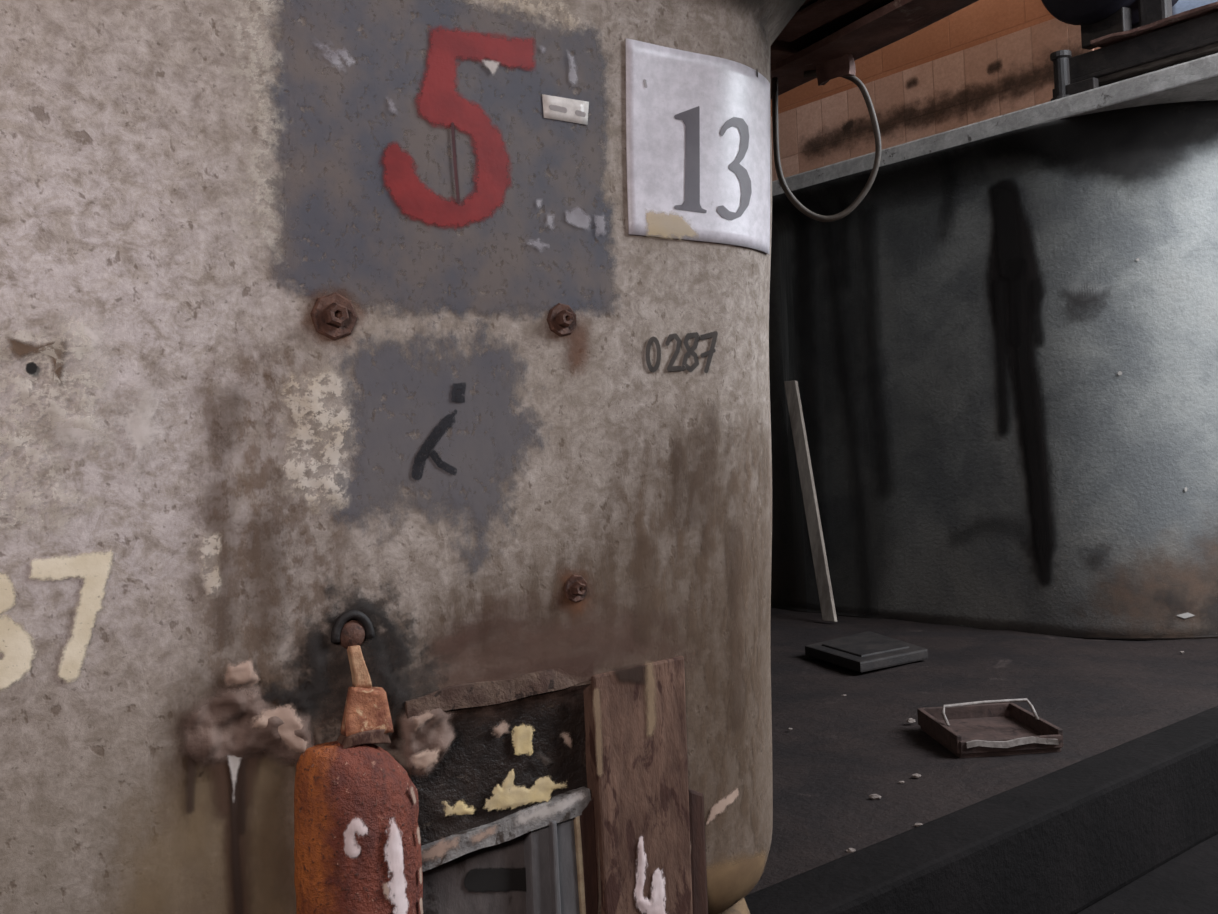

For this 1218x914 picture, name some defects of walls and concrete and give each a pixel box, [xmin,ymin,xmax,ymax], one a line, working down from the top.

damp [988,179,1056,585]
damp [213,362,412,714]
damp [128,755,288,914]
peeling [225,660,259,686]
peeling [252,704,308,753]
peeling [413,710,433,729]
peeling [412,747,440,770]
damp [519,431,762,837]